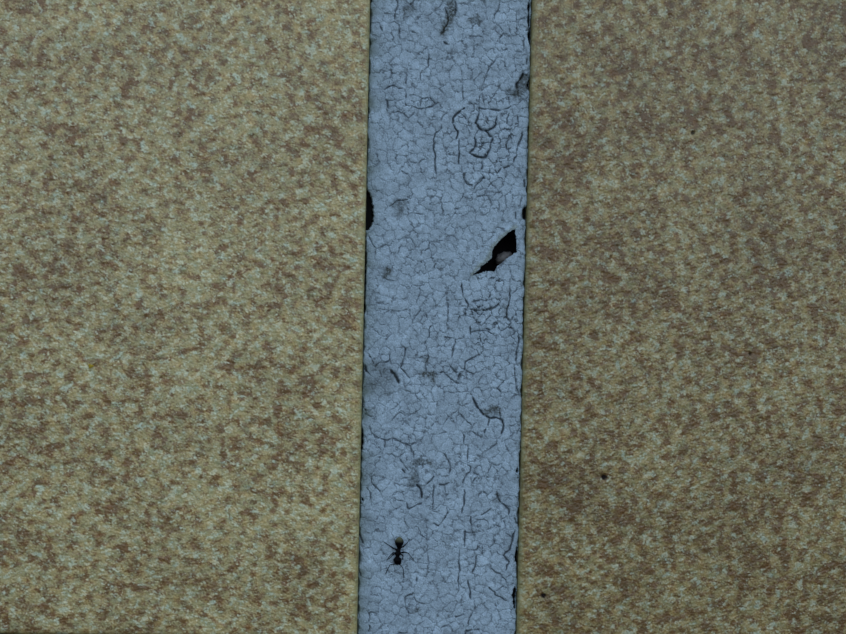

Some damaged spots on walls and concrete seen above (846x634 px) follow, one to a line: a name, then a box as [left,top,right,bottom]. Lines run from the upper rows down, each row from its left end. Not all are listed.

crack [452,108,497,162]